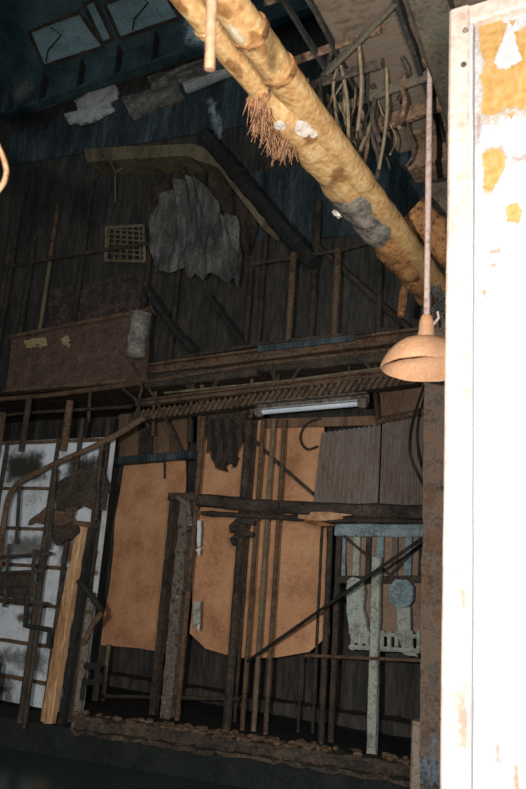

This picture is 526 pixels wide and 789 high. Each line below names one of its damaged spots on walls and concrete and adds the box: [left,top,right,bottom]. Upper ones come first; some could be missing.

peeling [477,20,526,119]
peeling [482,146,506,192]
peeling [506,202,522,224]